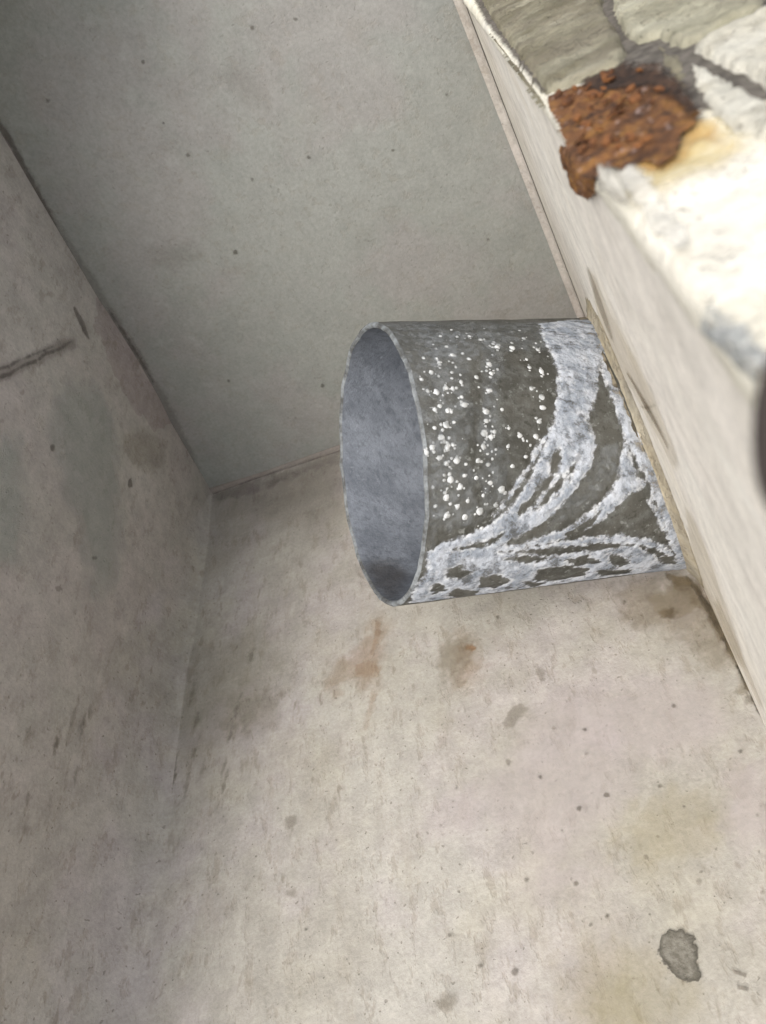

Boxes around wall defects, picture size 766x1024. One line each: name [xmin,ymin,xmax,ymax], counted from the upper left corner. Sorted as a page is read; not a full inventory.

rust [547,61,728,201]